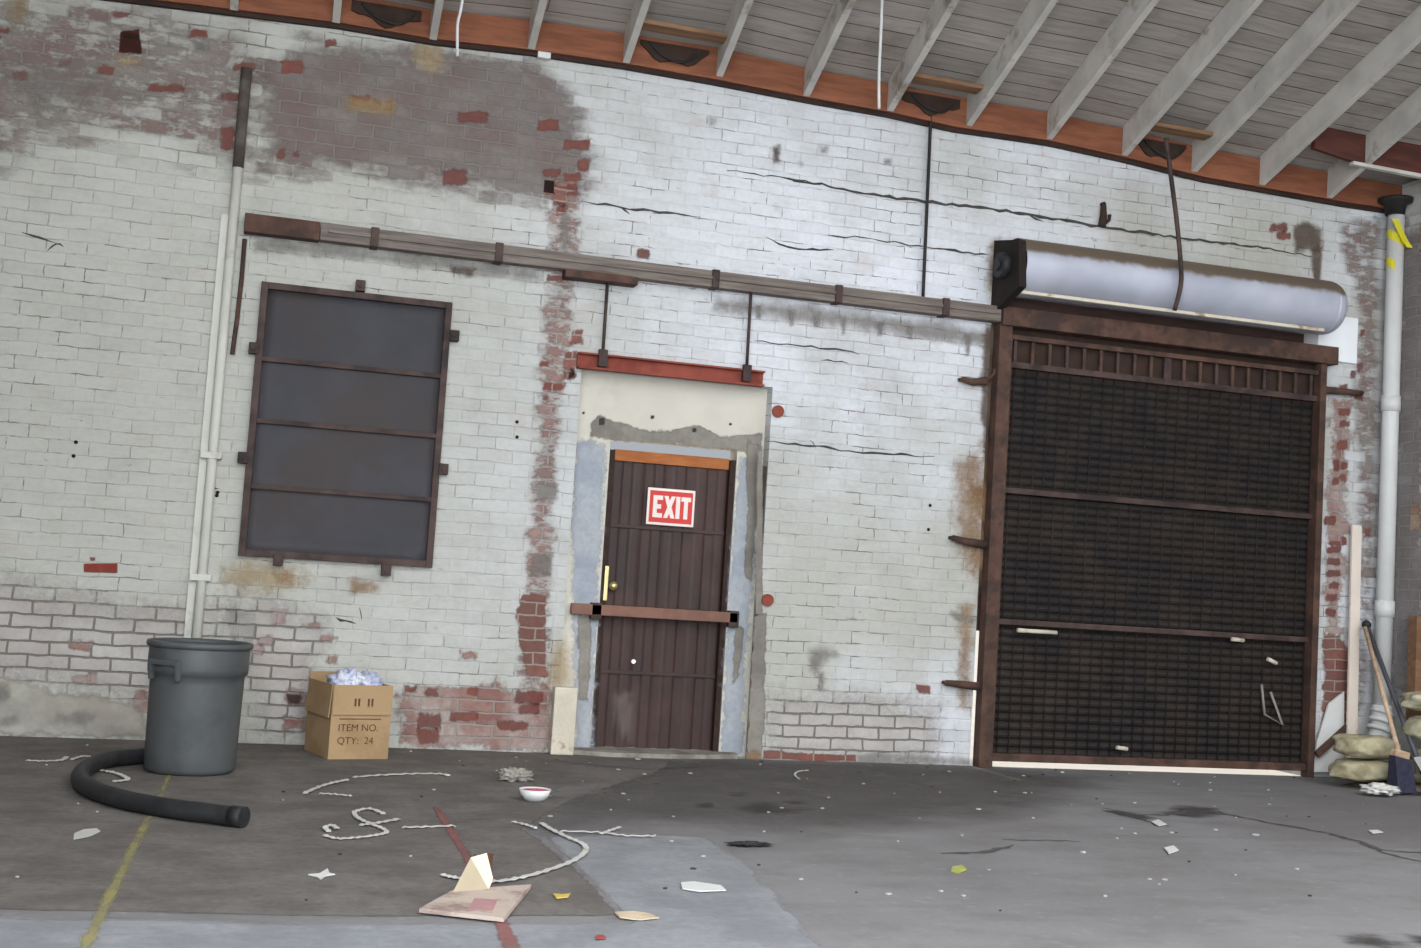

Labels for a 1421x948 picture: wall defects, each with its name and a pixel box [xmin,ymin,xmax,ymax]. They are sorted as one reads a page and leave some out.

peeling [0,3,591,253]
crack [581,201,696,217]
crack [727,170,1312,257]
flaking render [84,557,117,573]
peeling [395,270,973,764]
crack [766,440,935,457]
corrosion [958,328,993,563]
peeling [1321,221,1381,724]
peeling [1391,226,1421,694]
spalling [0,582,186,712]
peeling [202,601,337,736]
corrosion [953,606,971,703]